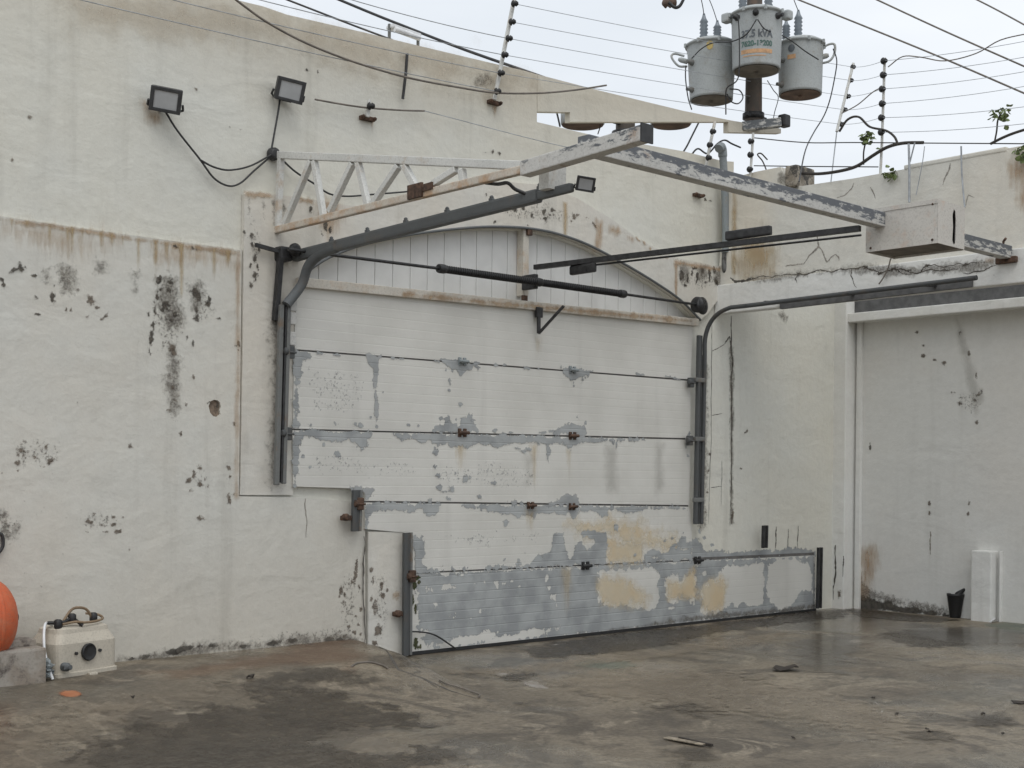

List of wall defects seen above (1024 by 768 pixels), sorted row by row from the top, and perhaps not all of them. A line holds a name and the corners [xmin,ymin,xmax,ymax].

mould [50,267,108,320]
corrosion [173,243,231,263]
crack [730,237,997,288]
mould [148,275,187,411]
hole [207,400,219,417]
peeling [291,349,404,488]
peeling [434,358,480,392]
peeling [560,366,593,387]
crack [708,317,734,524]
peeling [351,402,816,649]
mould [125,576,362,660]
damp [522,575,965,658]